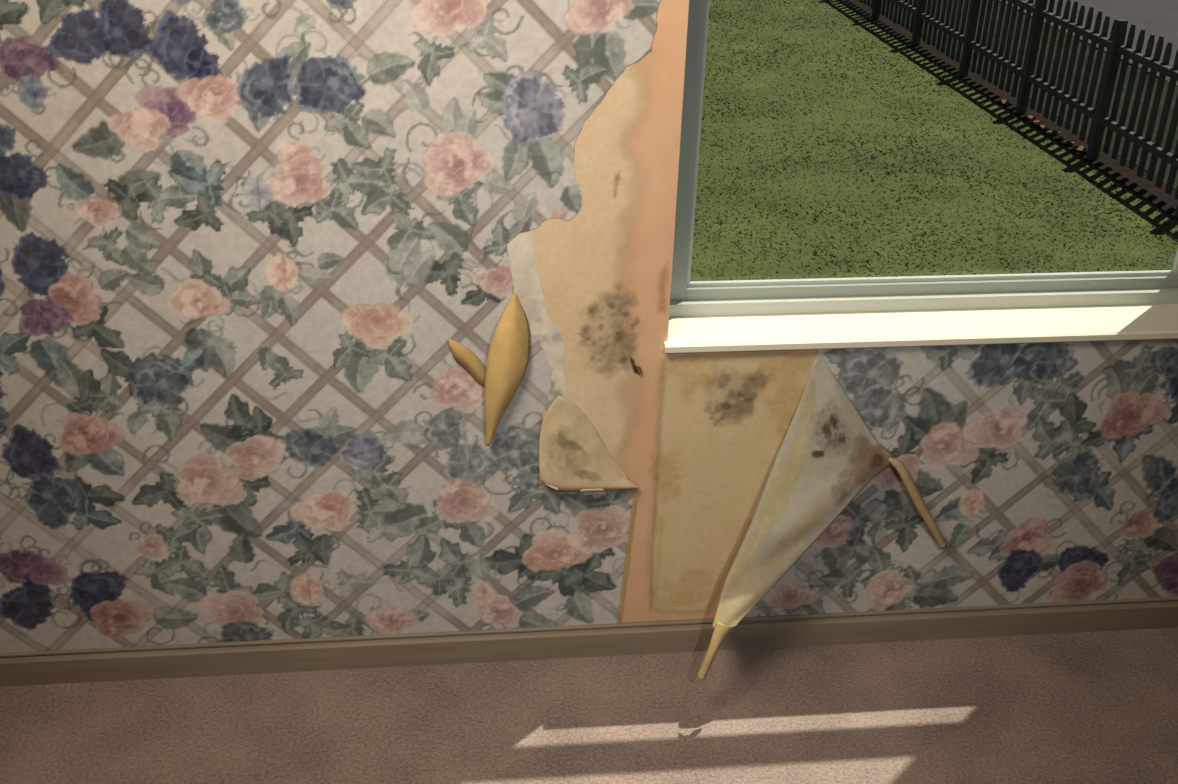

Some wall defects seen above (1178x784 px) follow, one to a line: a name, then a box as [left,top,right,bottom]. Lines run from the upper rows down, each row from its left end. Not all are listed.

peeling [507,63,644,465]
peeling [650,353,818,613]